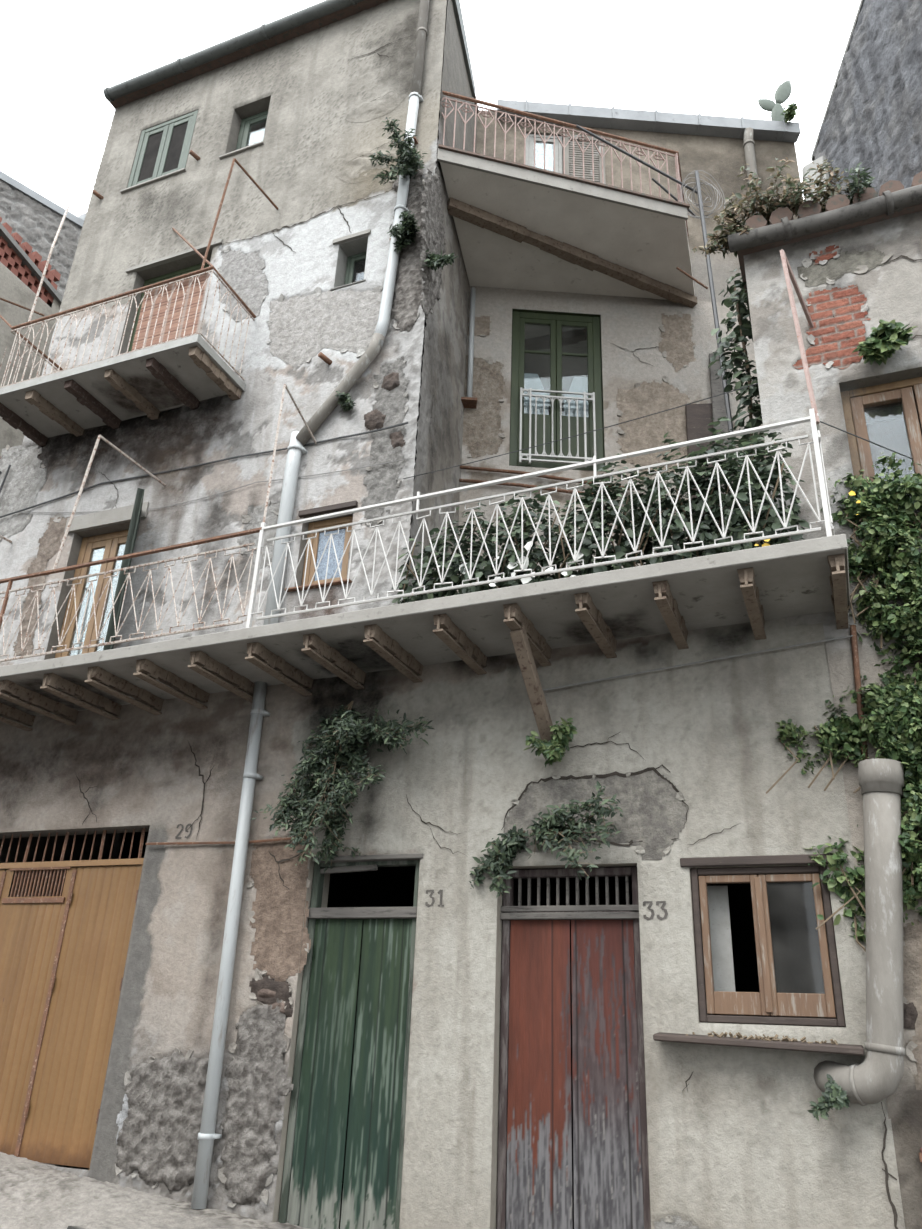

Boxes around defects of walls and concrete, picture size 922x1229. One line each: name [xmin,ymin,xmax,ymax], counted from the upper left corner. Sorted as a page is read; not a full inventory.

peeling [217,168,446,371]
flaking render [793,245,893,370]
crack [188,742,214,839]
spalling [503,770,687,860]
spalling [218,833,312,1208]
spalling [115,1048,209,1194]
crack [881,1102,898,1229]